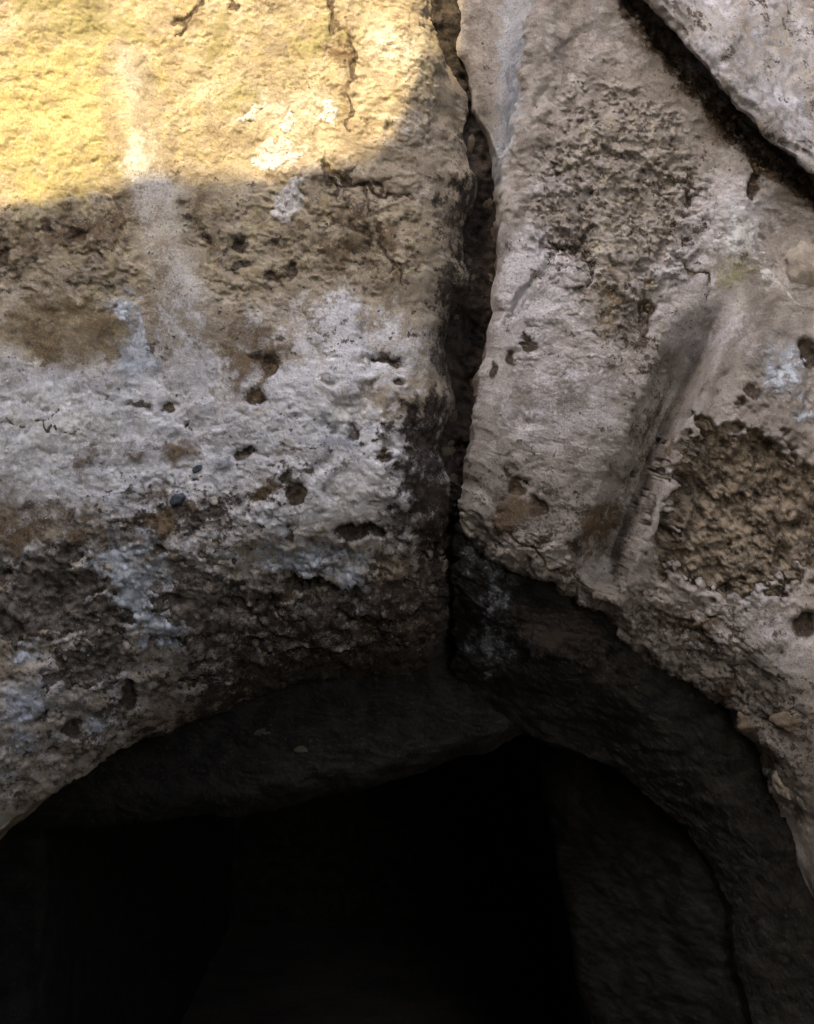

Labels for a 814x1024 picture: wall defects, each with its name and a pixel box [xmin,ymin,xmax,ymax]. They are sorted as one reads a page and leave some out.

crack [327,0,358,132]
leakage [572,396,685,556]
spalling [651,417,814,601]